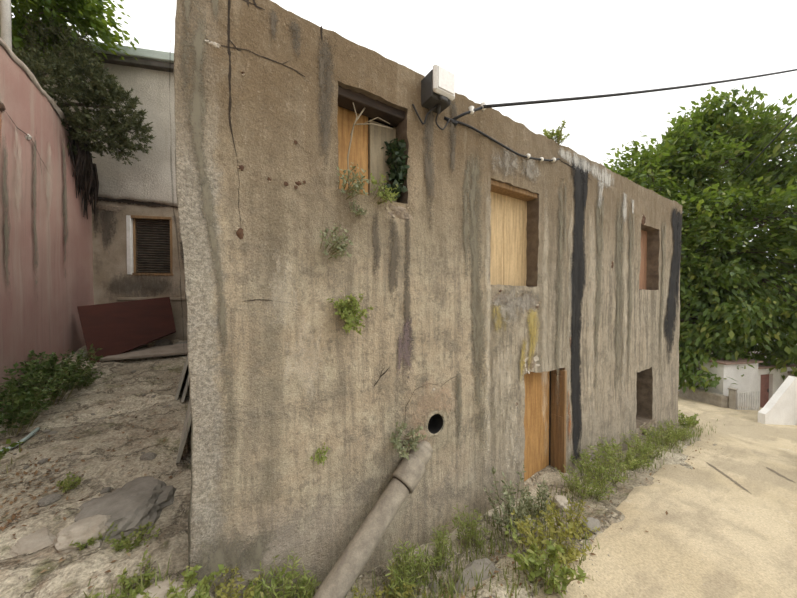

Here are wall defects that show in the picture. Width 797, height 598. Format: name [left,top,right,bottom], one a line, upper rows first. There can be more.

water stain [181,0,227,346]
crack [206,0,305,224]
water stain [317,40,333,164]
water stain [423,108,434,227]
water stain [372,214,414,378]
water stain [463,156,487,444]
water stain [555,159,590,464]
water stain [594,198,604,385]
water stain [614,201,635,386]
water stain [660,209,683,359]
water stain [455,373,463,442]